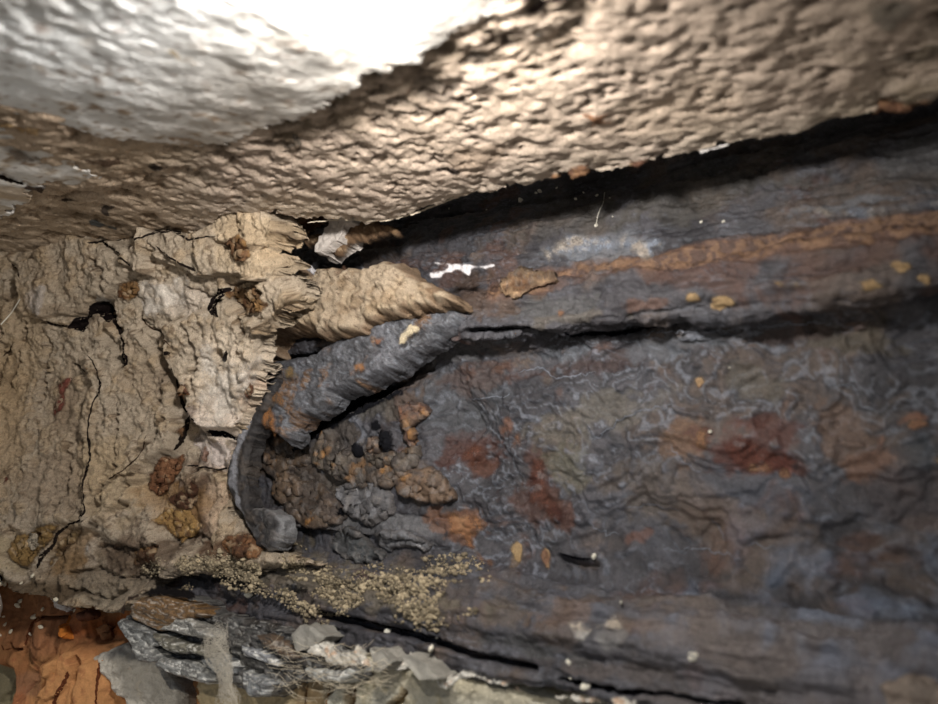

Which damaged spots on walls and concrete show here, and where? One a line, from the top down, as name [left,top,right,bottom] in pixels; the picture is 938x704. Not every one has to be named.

spalling [0,0,938,253]
rust [551,165,591,180]
crack [39,301,127,365]
crack [87,229,216,271]
peeling [430,263,495,278]
rust [686,293,734,310]
flaking render [0,209,328,613]
crack [171,368,237,471]
spalling [292,385,403,452]
crack [36,355,101,568]
rust [221,533,263,559]
rust [511,541,522,562]